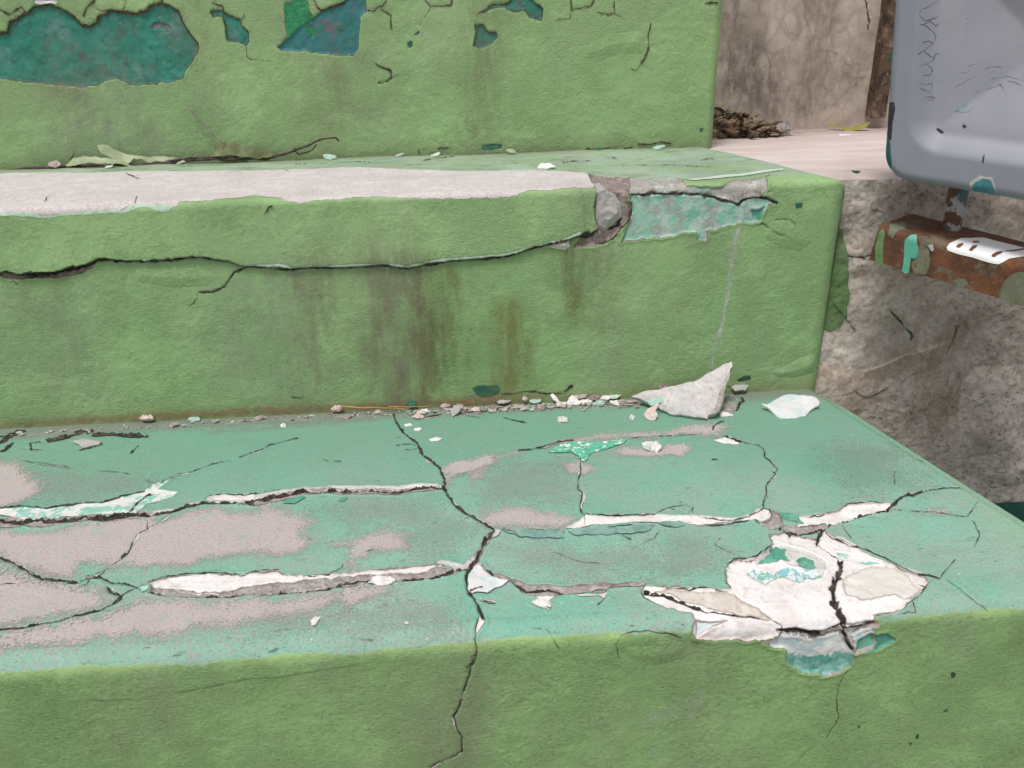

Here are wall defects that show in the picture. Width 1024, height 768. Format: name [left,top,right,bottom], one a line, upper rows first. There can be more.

peeling [0,0,199,88]
peeling [277,0,367,56]
crack [375,63,392,84]
peeling [473,0,543,49]
crack [555,0,621,21]
crack [631,23,651,71]
peeling [0,141,784,269]
crack [2,176,795,306]
peeling [542,384,749,475]
crack [0,385,604,768]
spalling [0,450,929,677]
crack [518,386,988,759]